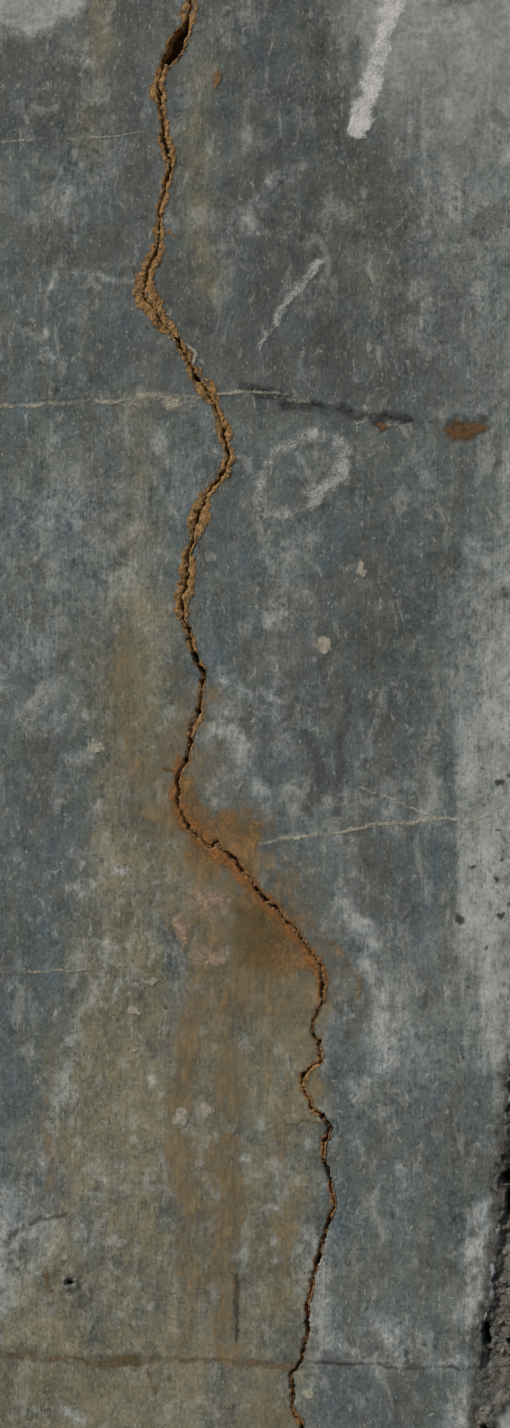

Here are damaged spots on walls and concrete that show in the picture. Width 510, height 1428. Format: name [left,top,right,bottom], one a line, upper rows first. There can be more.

crack [0,0,363,1428]
corrosion [160,692,330,1017]
spalling [468,1054,510,1428]